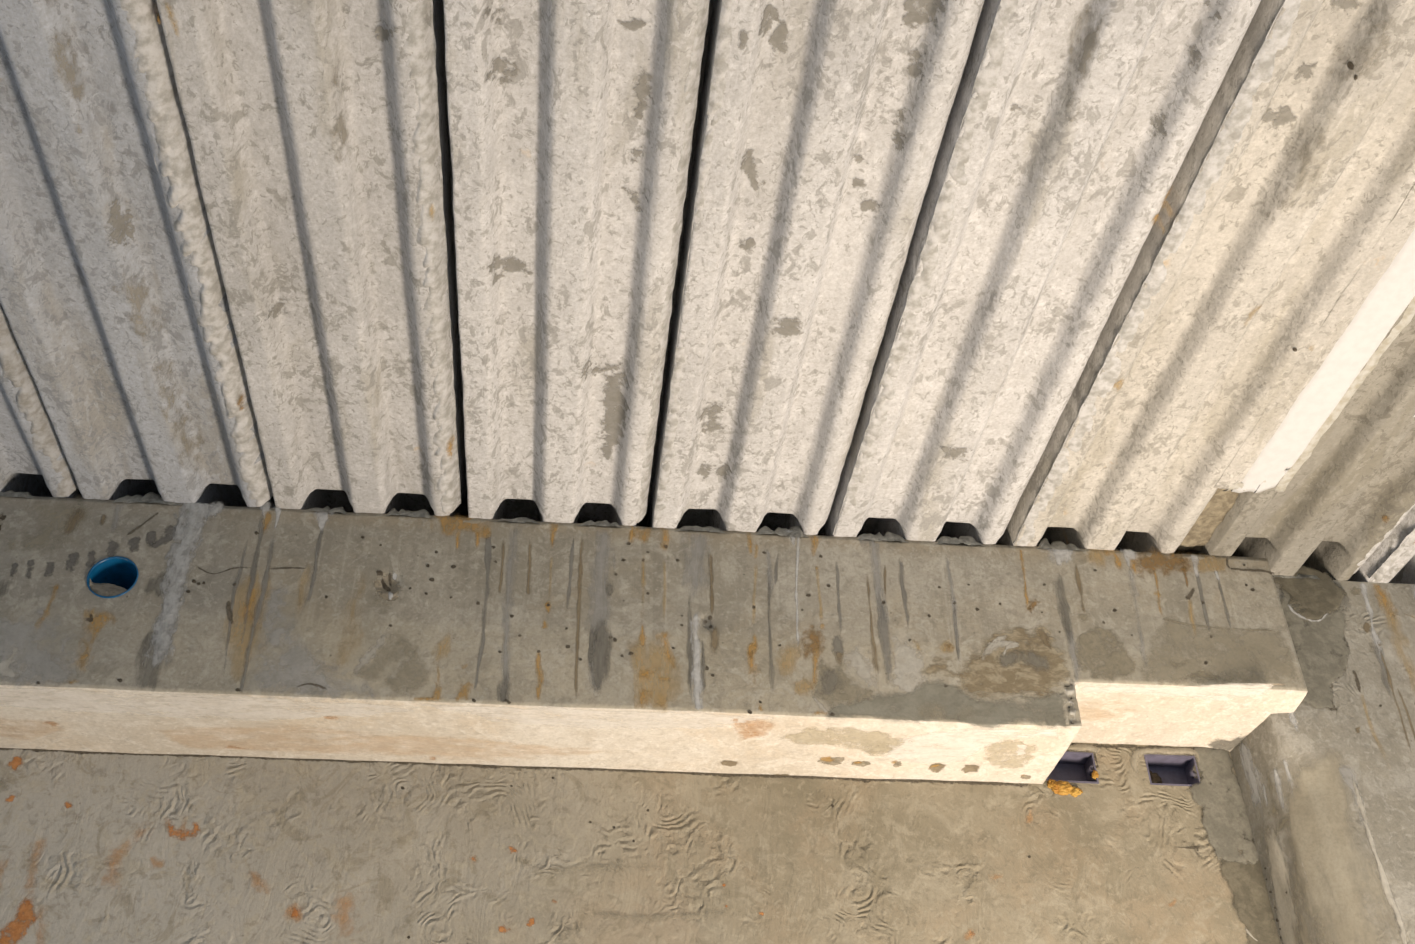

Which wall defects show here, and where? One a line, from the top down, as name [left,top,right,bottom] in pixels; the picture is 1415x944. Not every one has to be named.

water stain [140,502,223,688]
water stain [567,533,612,691]
water stain [687,535,714,709]
rust [1095,552,1219,625]